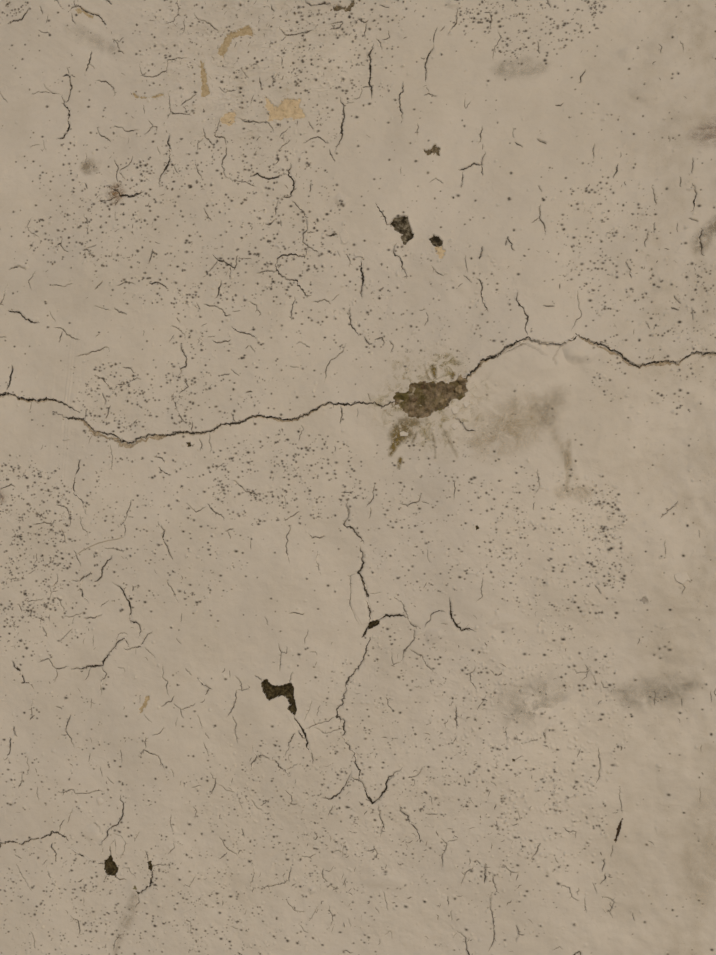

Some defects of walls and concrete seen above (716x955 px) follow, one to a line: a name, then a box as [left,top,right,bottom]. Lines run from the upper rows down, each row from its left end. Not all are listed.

peeling [217,25,253,57]
peeling [390,216,414,245]
peeling [429,235,446,259]
spalling [393,374,468,419]
crack [0,0,558,955]